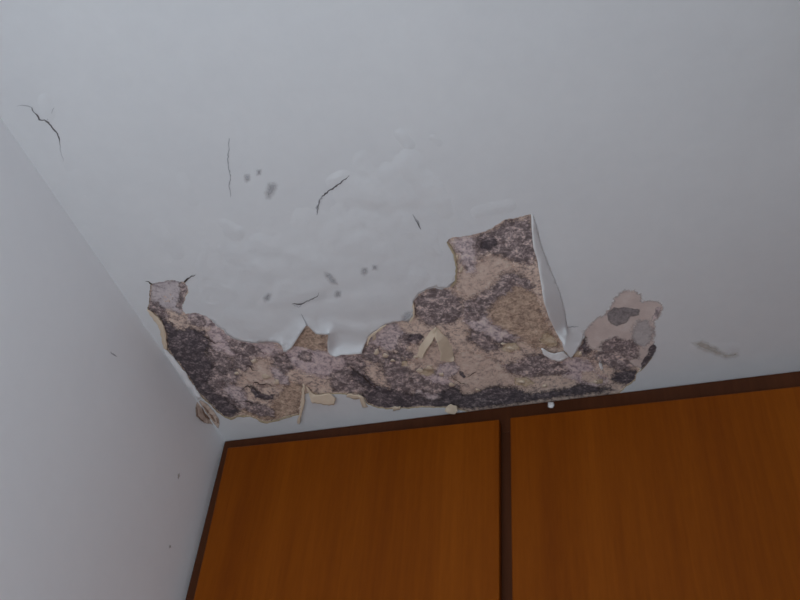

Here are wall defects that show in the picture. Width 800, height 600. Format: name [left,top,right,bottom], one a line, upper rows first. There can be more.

crack [19,105,63,158]
crack [225,138,233,197]
crack [316,176,349,214]
peeling [147,214,663,428]